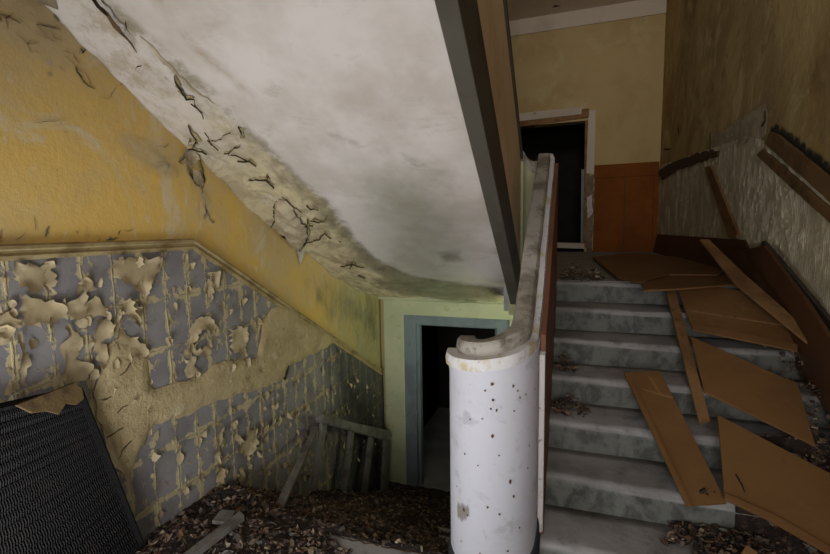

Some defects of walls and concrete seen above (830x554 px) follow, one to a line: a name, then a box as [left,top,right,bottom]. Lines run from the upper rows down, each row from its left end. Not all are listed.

flaking render [37,0,58,10]
crack [0,14,114,99]
flaking render [92,0,214,104]
crack [157,75,274,224]
damp [770,124,830,175]
crack [292,205,341,243]
damp [354,247,499,302]
flaking render [0,254,380,486]